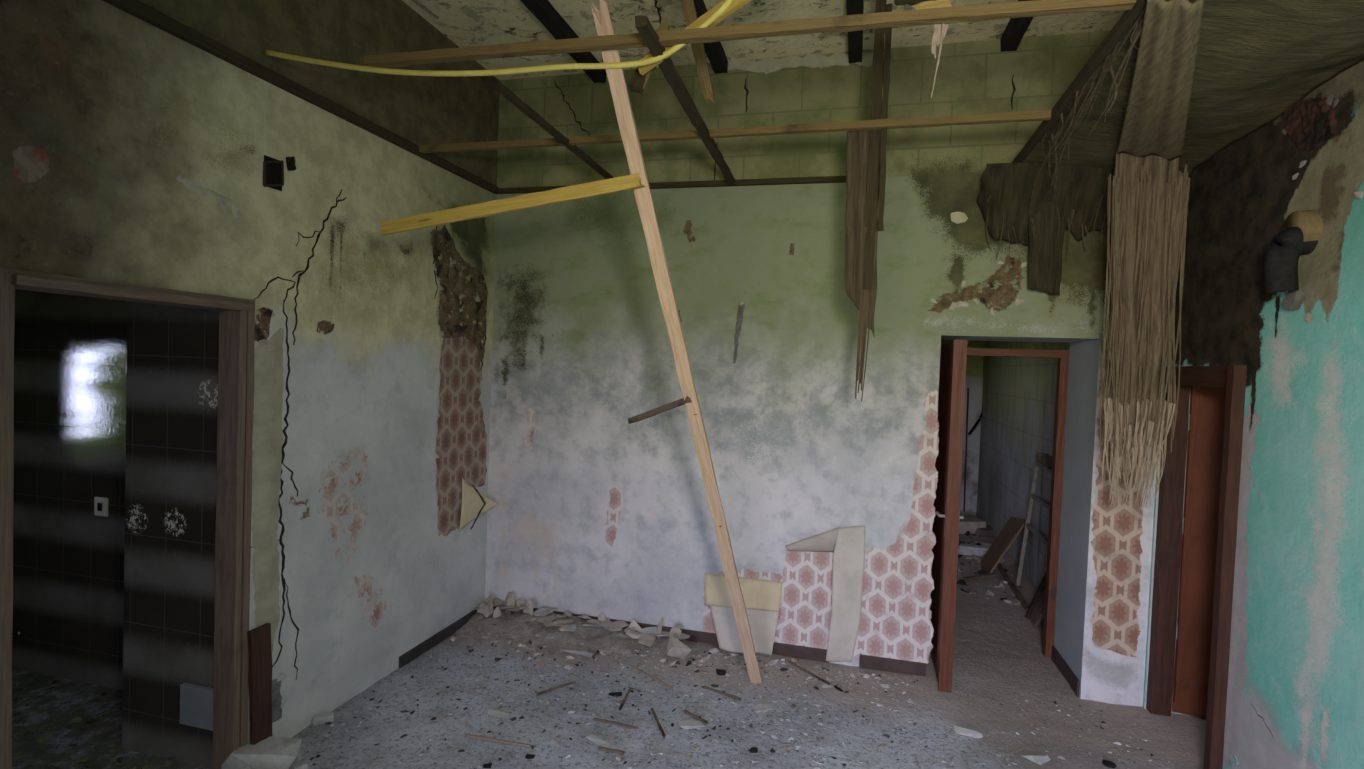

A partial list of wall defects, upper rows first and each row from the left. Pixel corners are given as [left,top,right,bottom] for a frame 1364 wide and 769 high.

flaking render [728,51,873,74]
flaking render [428,225,490,362]
damp [423,185,579,410]
peeling [950,212,968,224]
flaking render [928,255,1028,317]
flaking render [1284,102,1364,324]
crack [251,189,347,680]
peeling [459,478,500,532]
peeling [785,526,874,662]